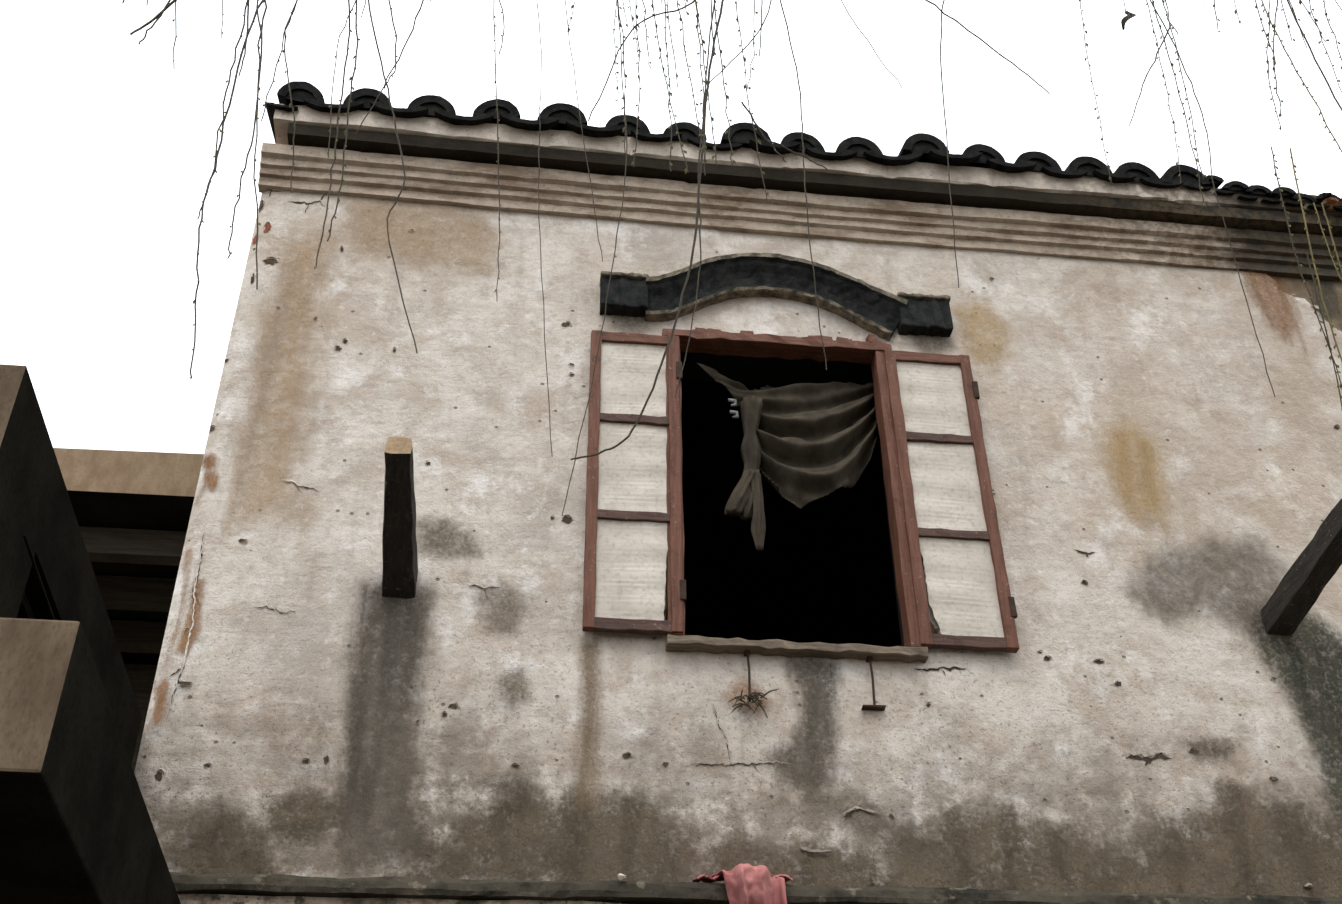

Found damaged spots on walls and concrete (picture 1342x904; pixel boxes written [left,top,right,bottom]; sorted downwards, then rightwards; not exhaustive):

flaking render [1273,276,1342,331]
rust [203,454,218,490]
water stain [423,521,473,556]
crack [166,534,205,721]
crack [682,705,792,772]
water stain [174,545,1342,898]
crack [1125,750,1172,765]